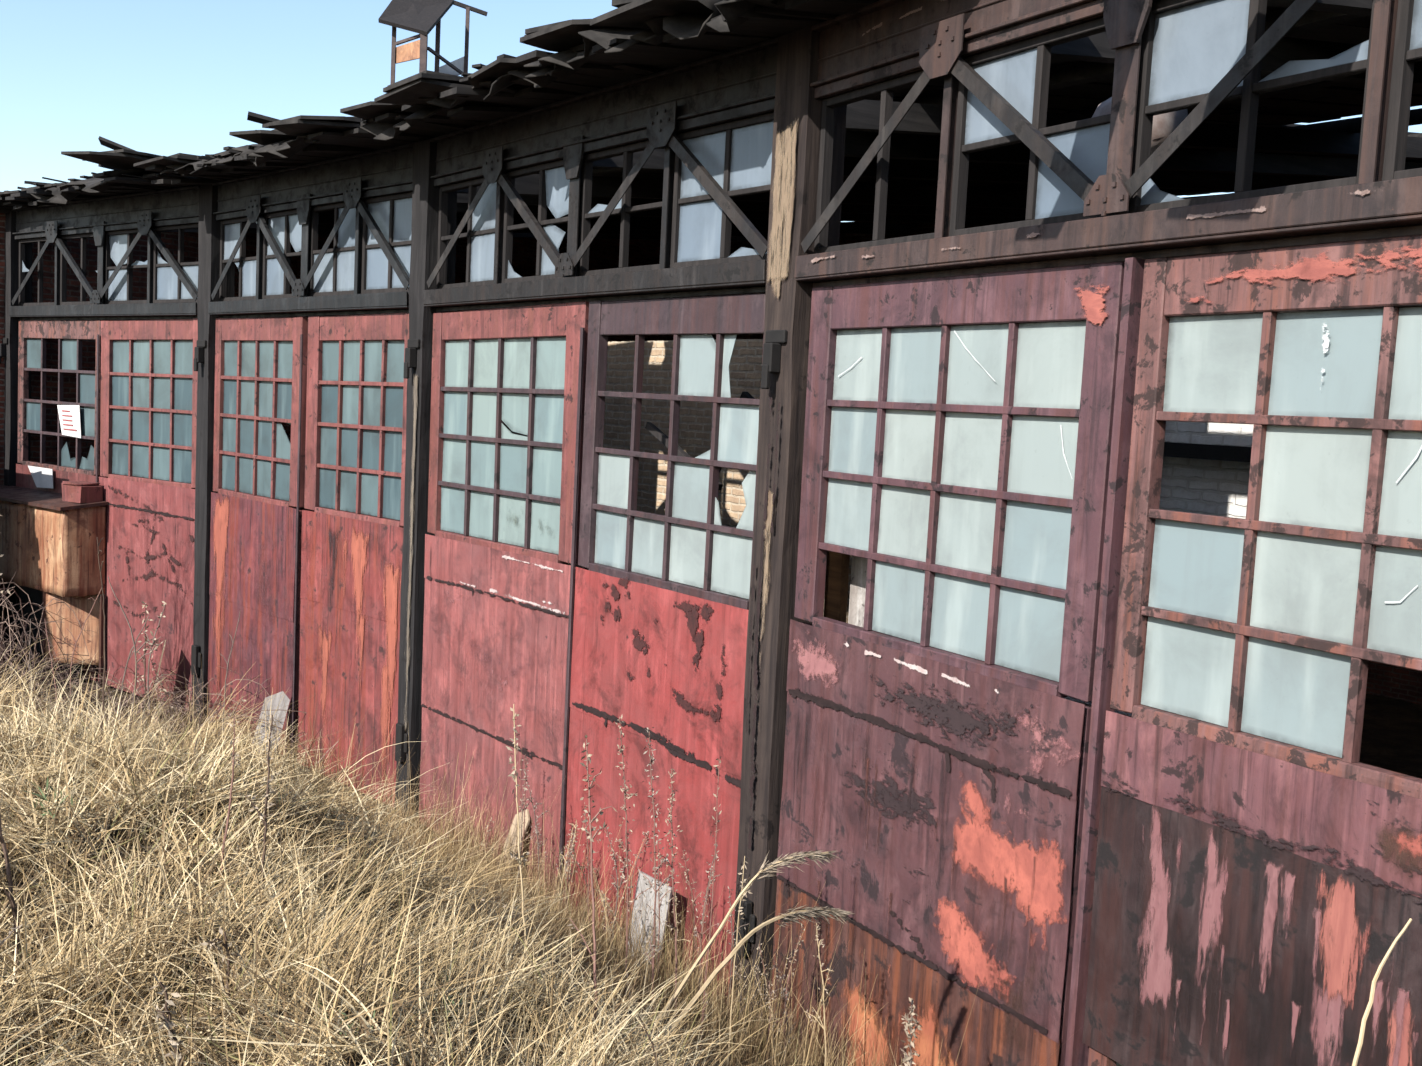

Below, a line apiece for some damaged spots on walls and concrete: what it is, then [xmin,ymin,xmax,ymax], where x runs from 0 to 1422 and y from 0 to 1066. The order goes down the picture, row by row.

peeling [1074,284,1109,326]
peeling [1184,246,1422,303]
peeling [839,743,1067,945]
peeling [934,897,1016,1001]
peeling [1139,809,1181,1009]
peeling [1197,831,1228,1017]
peeling [1259,862,1295,993]
peeling [1291,873,1369,1066]
peeling [1373,981,1417,1066]